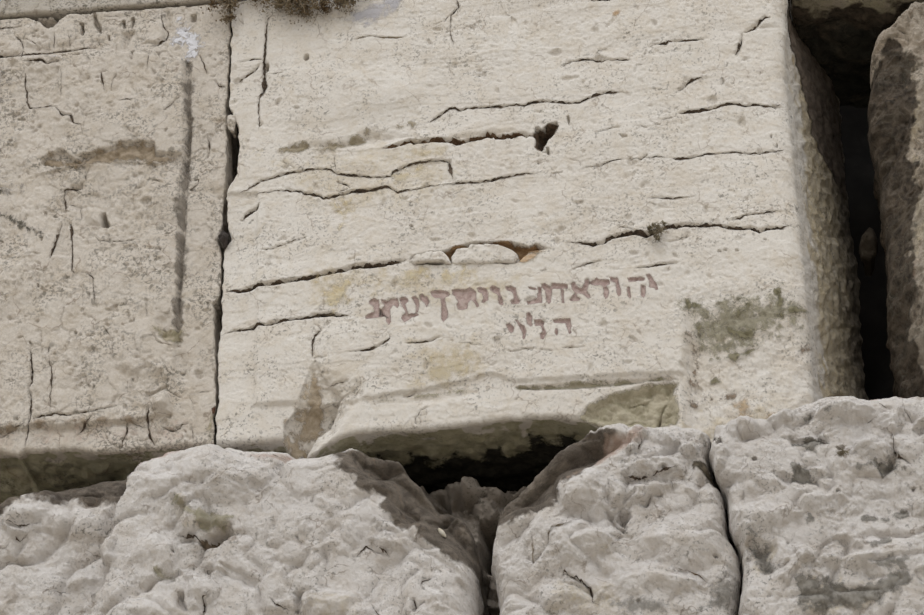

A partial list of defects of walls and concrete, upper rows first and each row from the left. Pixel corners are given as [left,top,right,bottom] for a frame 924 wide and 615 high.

crack [561,38,705,68]
crack [666,77,780,119]
crack [240,91,624,221]
crack [588,150,783,167]
crack [569,211,797,267]
crack [224,259,407,293]
water stain [774,288,807,317]
water stain [709,349,754,361]